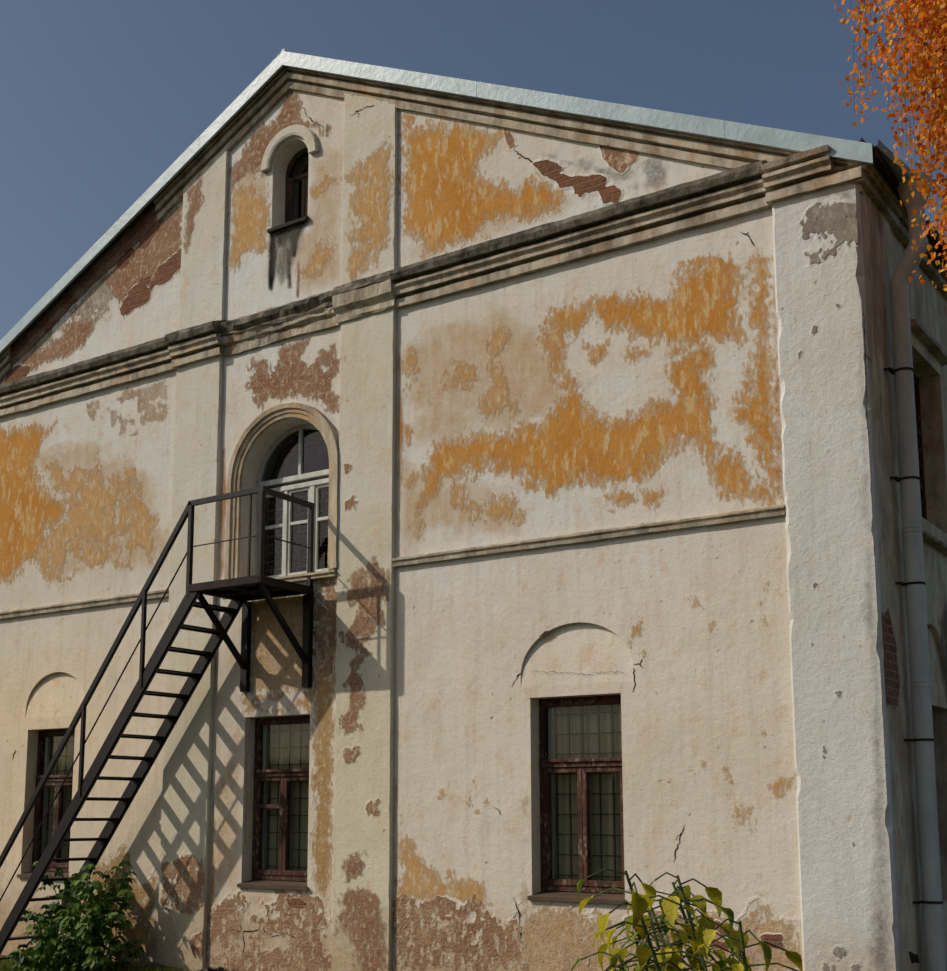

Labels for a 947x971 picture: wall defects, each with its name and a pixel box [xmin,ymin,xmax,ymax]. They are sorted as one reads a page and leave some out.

flaking render [0,177,204,385]
peeling [299,238,337,279]
peeling [309,113,642,282]
flaking render [245,336,340,414]
peeling [398,346,420,391]
peeling [403,252,784,541]
peeling [0,416,159,585]
crack [512,659,642,692]
flaking render [83,556,802,971]
flaking render [820,944,862,971]